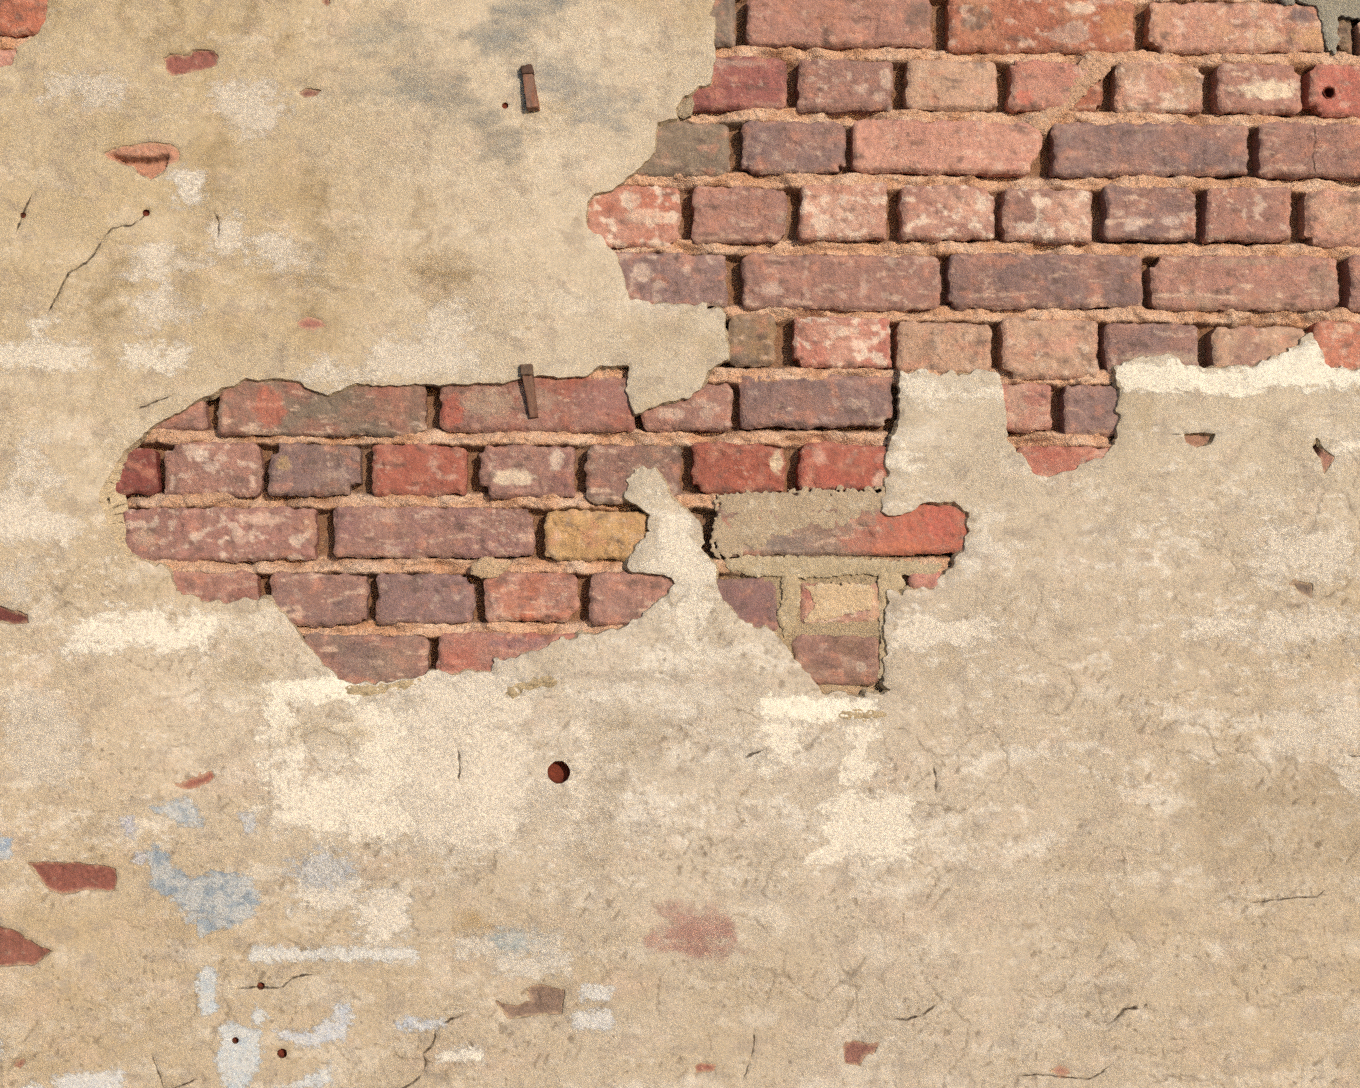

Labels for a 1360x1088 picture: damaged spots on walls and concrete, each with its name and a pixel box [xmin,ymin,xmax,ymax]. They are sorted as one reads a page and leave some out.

crack [50,215,145,309]
flaking render [98,0,1360,698]
flaking render [27,861,117,896]
flaking render [0,926,52,968]